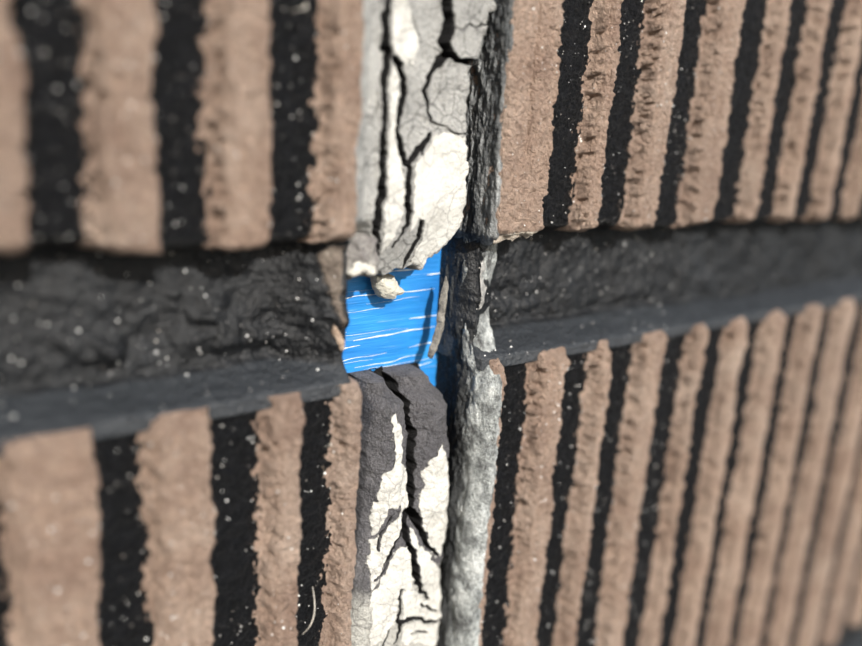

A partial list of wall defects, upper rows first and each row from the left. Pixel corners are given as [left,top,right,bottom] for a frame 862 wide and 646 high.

crack [435,52,478,66]
peeling [348,261,376,276]
crack [374,366,385,381]
crack [374,509,415,582]
crack [395,598,442,631]